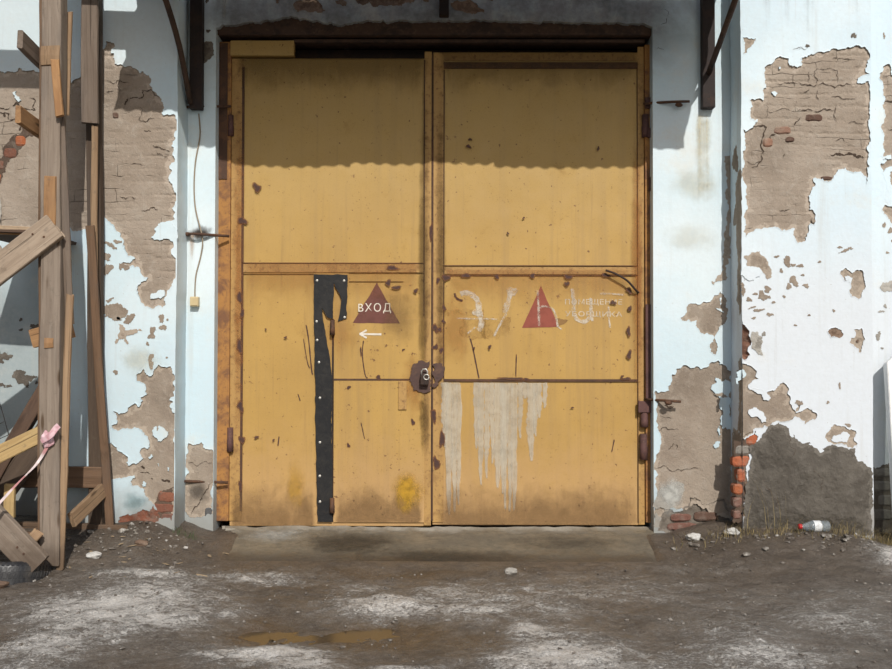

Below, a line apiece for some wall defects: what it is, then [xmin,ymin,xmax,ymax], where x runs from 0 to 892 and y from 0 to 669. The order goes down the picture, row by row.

peeling [291,0,326,14]
peeling [335,0,429,8]
peeling [449,0,493,16]
peeling [742,36,757,55]
peeling [0,67,39,227]
peeling [66,73,87,233]
peeling [102,40,179,522]
peeling [652,44,892,533]
peeling [185,441,214,518]